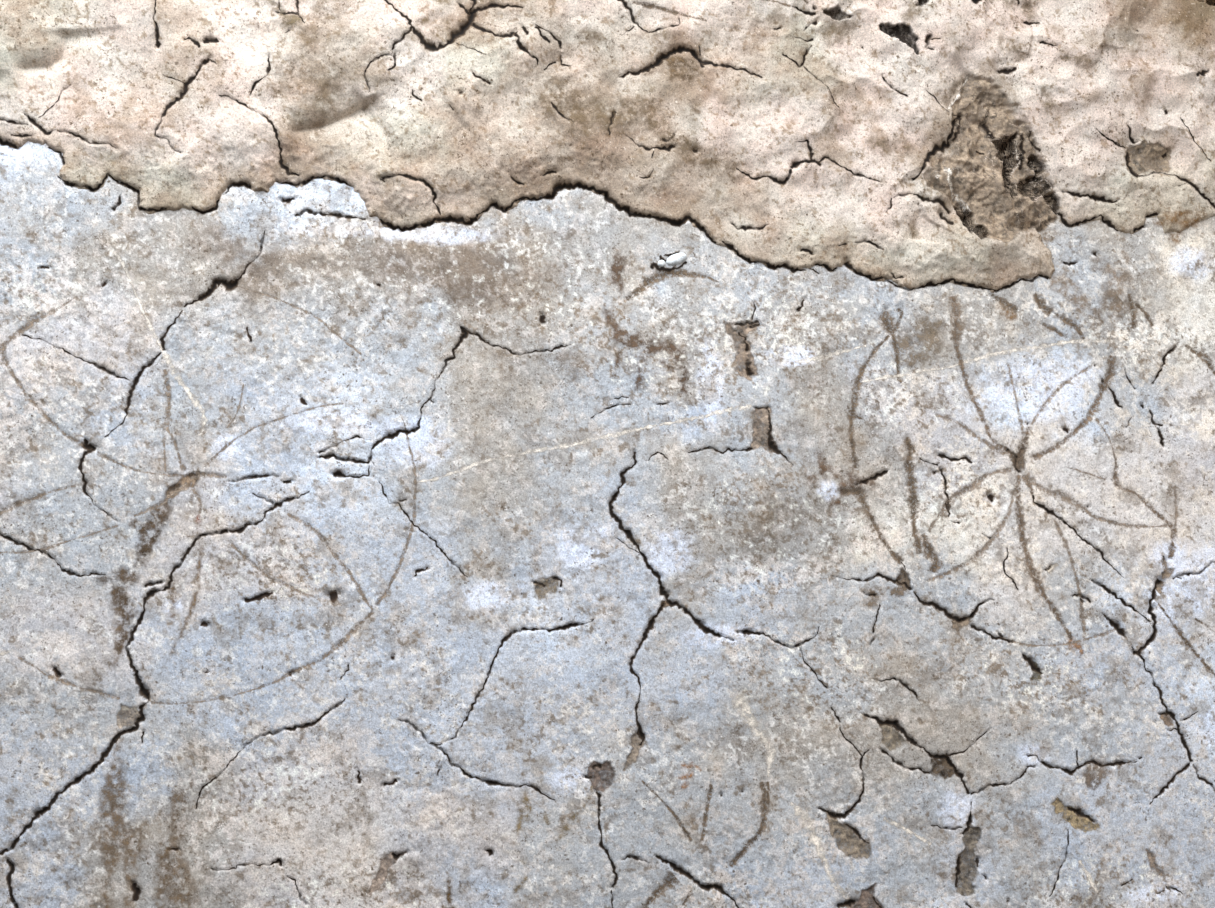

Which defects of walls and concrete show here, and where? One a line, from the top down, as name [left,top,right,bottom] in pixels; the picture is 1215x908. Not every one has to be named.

crack [0,0,1096,292]
spalling [913,79,1059,243]
crack [22,231,265,520]
crack [319,326,568,577]
spalling [725,302,760,380]
spalling [842,437,942,590]
crack [0,474,309,908]
spalling [585,732,646,792]
spalling [818,807,871,859]
crack [609,446,1142,834]
spalling [955,827,987,908]
crack [1032,495,1215,804]